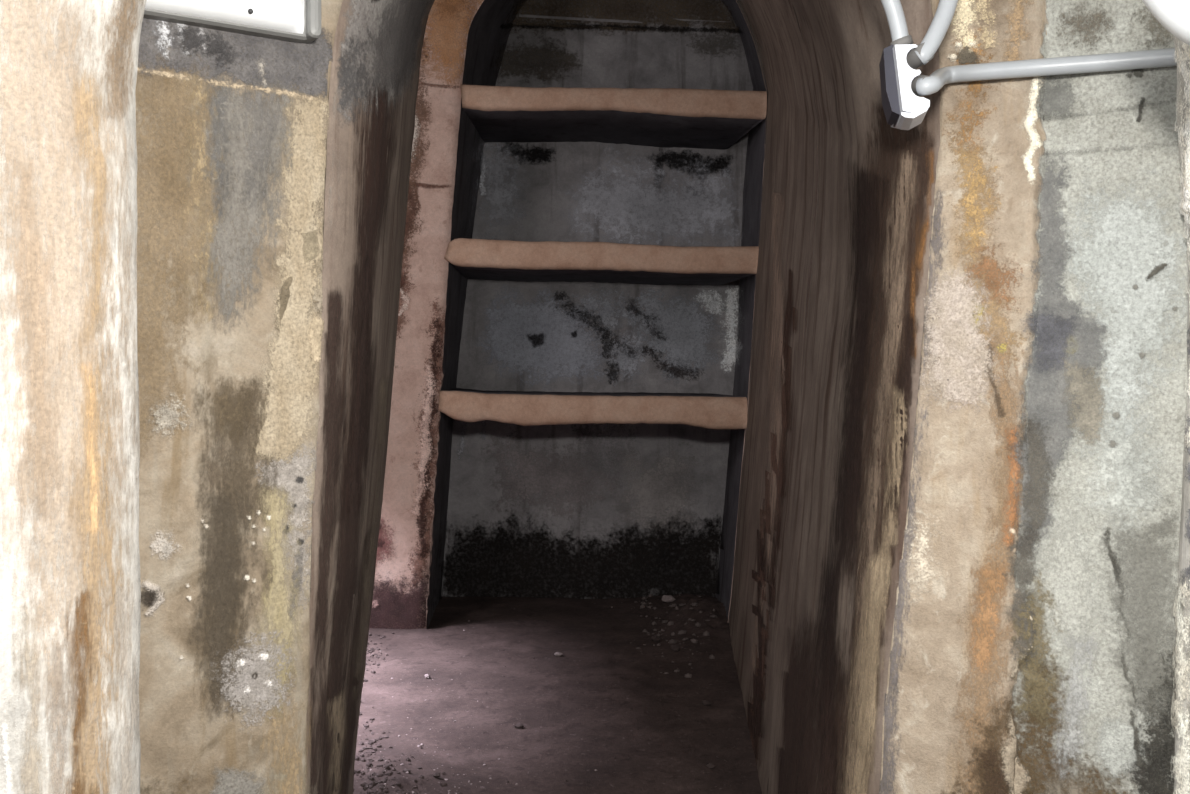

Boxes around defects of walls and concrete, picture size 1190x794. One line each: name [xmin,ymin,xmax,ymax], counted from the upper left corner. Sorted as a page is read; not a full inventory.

rust [421,0,483,84]
damp [954,0,1034,65]
damp [1056,6,1111,49]
damp [1130,6,1172,50]
damp [0,0,742,794]
damp [778,77,1187,794]
flaking render [1010,0,1190,794]
crack [1182,411,1190,480]
rust [955,342,1027,794]
crack [1179,509,1190,663]